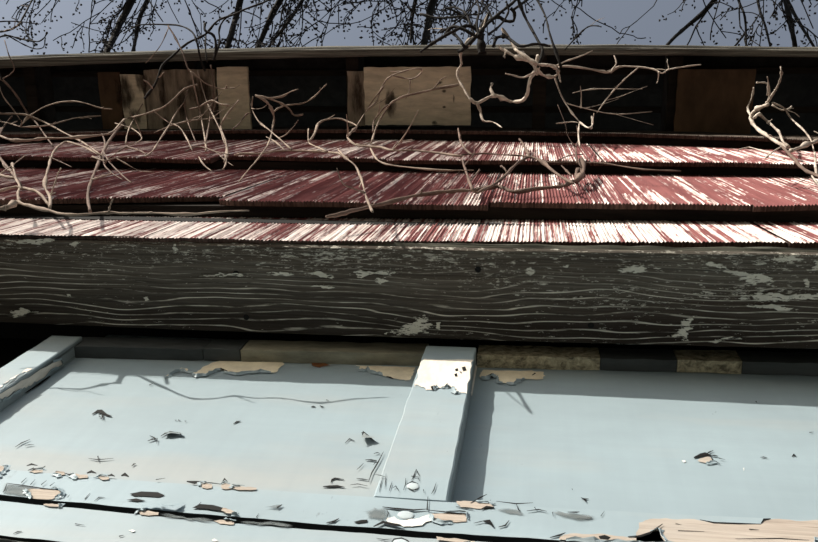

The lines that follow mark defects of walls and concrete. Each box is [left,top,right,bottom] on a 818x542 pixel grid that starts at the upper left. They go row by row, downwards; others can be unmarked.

peeling [773,255,803,264]
peeling [308,271,335,289]
peeling [738,273,818,311]
peeling [10,308,38,318]
peeling [0,358,65,401]
peeling [165,361,284,378]
peeling [356,359,545,396]
peeling [0,463,129,508]
peeling [187,478,256,490]
peeling [355,494,604,527]
peeling [550,518,818,542]